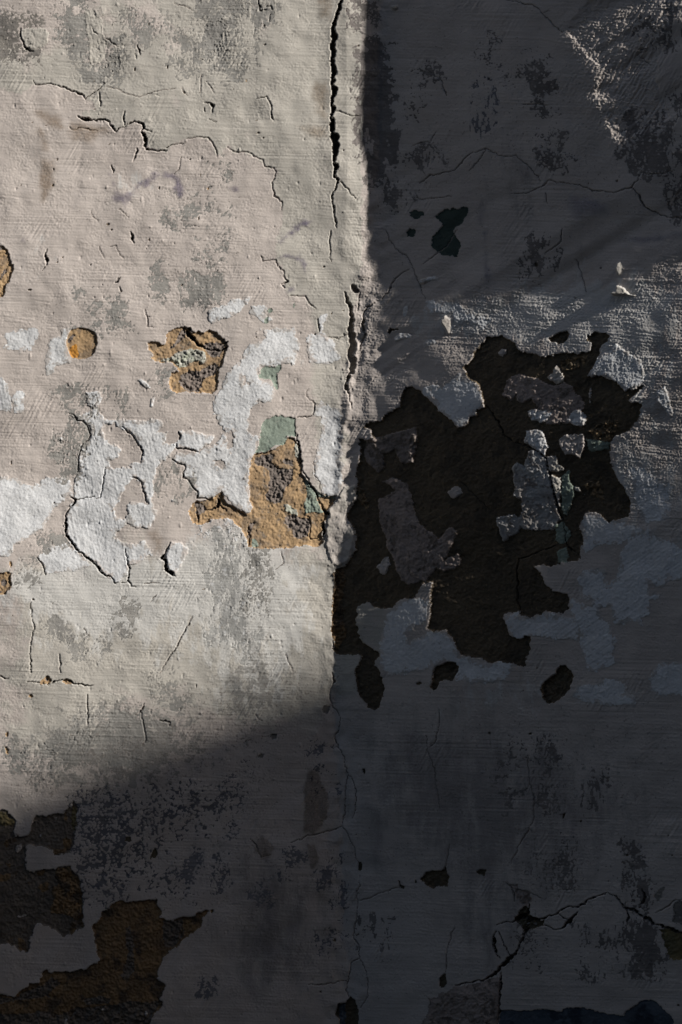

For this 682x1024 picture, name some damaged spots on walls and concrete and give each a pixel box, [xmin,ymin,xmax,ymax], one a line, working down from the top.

crack [33,75,283,210]
crack [329,0,356,262]
crack [64,467,176,602]
crack [124,428,147,503]
spalling [0,154,682,710]
spalling [0,662,237,1024]
crack [445,755,682,1024]